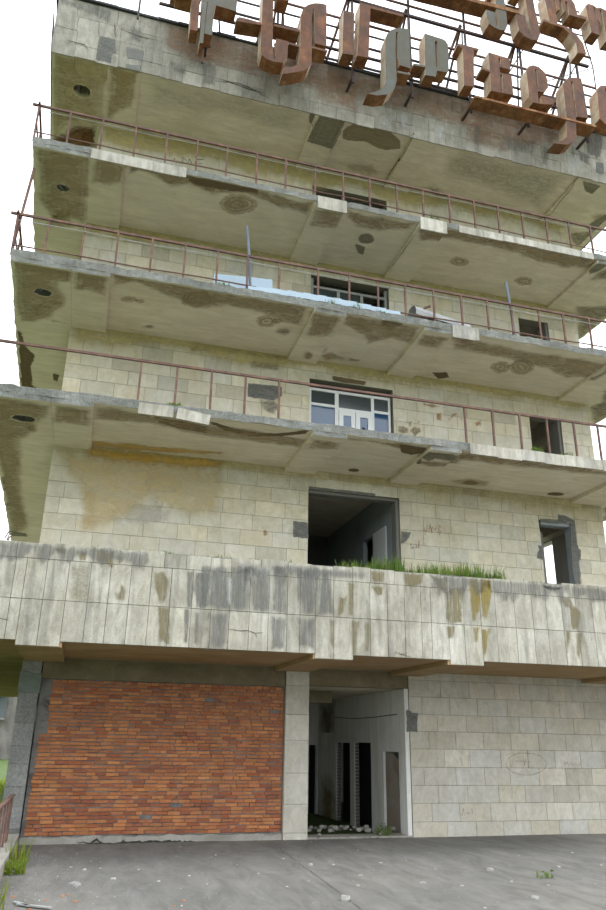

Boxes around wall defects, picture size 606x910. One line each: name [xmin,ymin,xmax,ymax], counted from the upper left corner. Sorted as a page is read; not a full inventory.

water stain [39,151,409,230]
water stain [105,127,559,230]
water stain [15,263,305,333]
water stain [112,226,606,335]
peeling [18,331,36,388]
water stain [78,325,606,419]
water stain [310,315,606,380]
water stain [0,399,45,530]
water stain [99,410,334,448]
spalling [540,514,581,584]
water stain [185,565,369,653]
water stain [405,573,582,654]